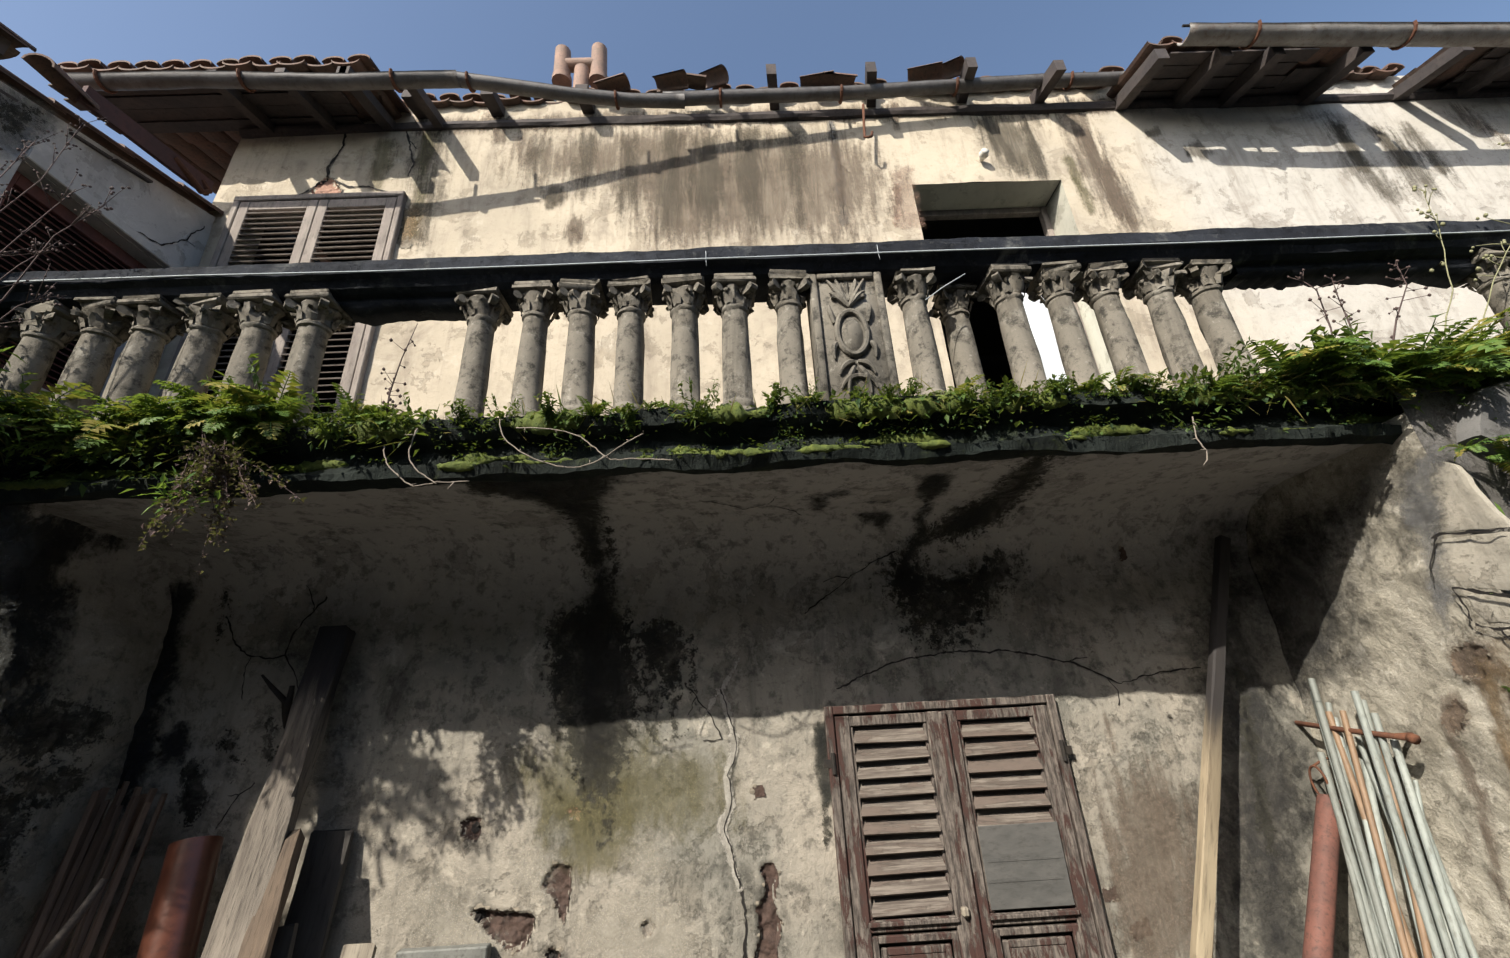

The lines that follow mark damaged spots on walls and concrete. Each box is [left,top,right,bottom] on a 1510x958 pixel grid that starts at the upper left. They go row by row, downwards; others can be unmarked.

crack [301,131,417,194]
damp [407,103,907,249]
damp [924,99,1139,232]
damp [0,502,282,880]
crack [225,585,328,698]
damp [464,476,705,870]
crack [836,649,1201,705]
spalling [458,813,484,842]
crack [684,658,748,958]
spalling [470,903,535,957]
spalling [541,861,572,925]
peeling [751,863,783,958]